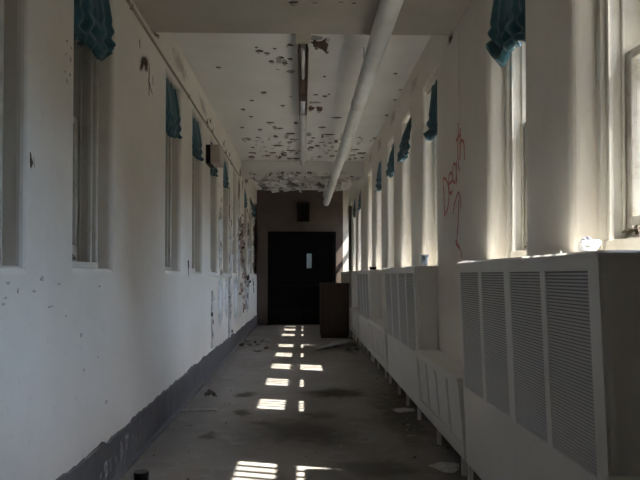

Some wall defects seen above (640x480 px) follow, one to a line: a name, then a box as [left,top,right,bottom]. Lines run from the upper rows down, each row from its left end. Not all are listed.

flaking render [311,35,330,54]
peeling [255,47,295,74]
peeling [241,122,342,161]
peeling [249,171,360,193]
flaking render [214,204,255,337]